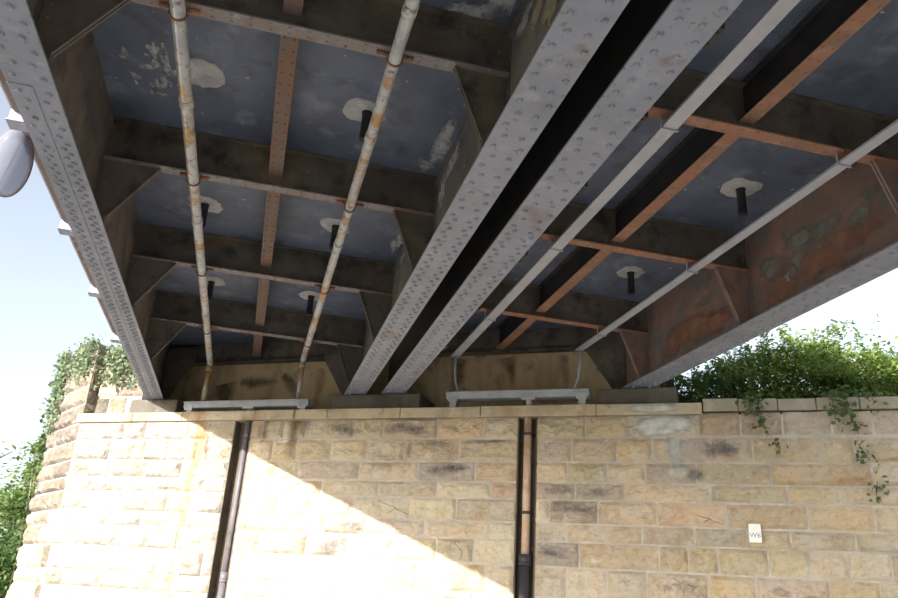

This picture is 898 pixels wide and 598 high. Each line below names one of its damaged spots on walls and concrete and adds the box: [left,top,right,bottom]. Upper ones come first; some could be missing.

peeling [447,0,516,19]
peeling [516,0,558,36]
peeling [130,41,178,96]
peeling [420,121,460,210]